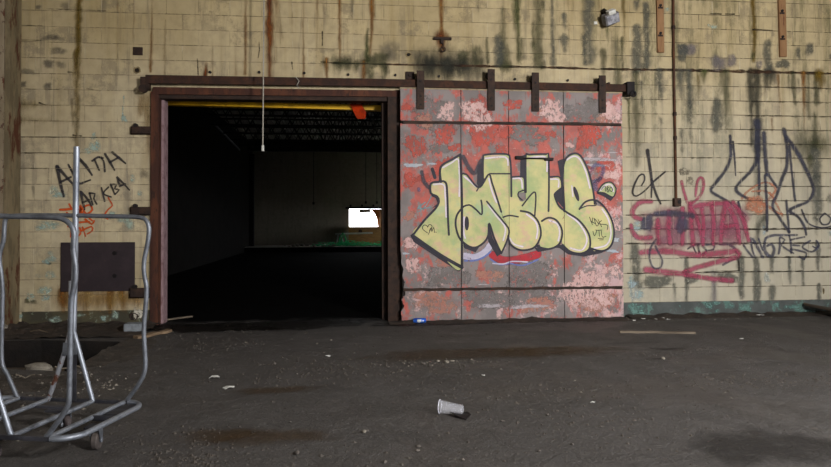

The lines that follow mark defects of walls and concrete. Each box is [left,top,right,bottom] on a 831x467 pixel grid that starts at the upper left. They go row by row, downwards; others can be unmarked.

damp [337,35,388,79]
corrosion [436,0,445,50]
damp [416,0,519,77]
damp [534,10,542,67]
damp [551,0,568,65]
damp [621,0,662,129]
damp [677,70,692,110]
damp [678,44,695,61]
damp [711,56,736,131]
damp [748,41,794,153]